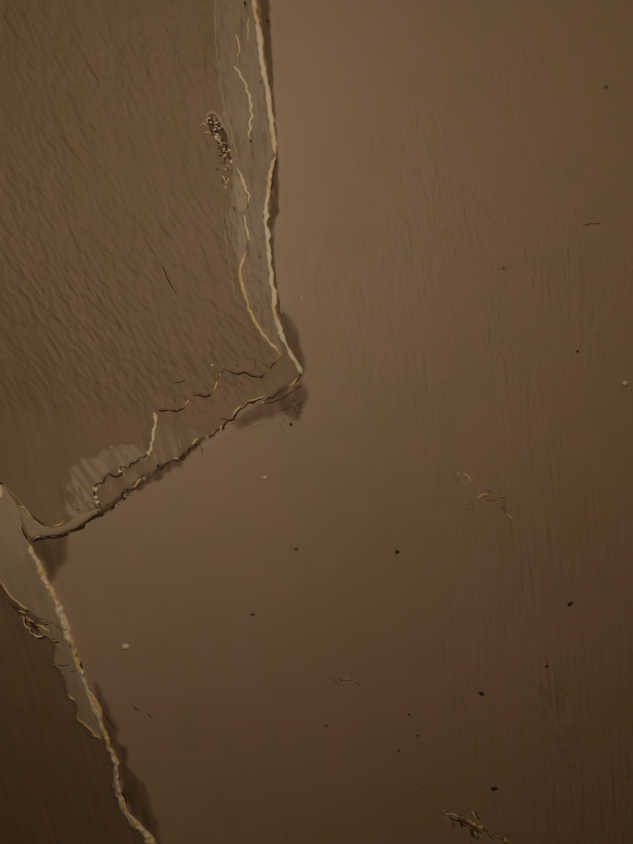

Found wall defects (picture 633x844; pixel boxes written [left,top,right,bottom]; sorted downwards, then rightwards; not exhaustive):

peeling [199,0,283,357]
peeling [0,414,201,740]